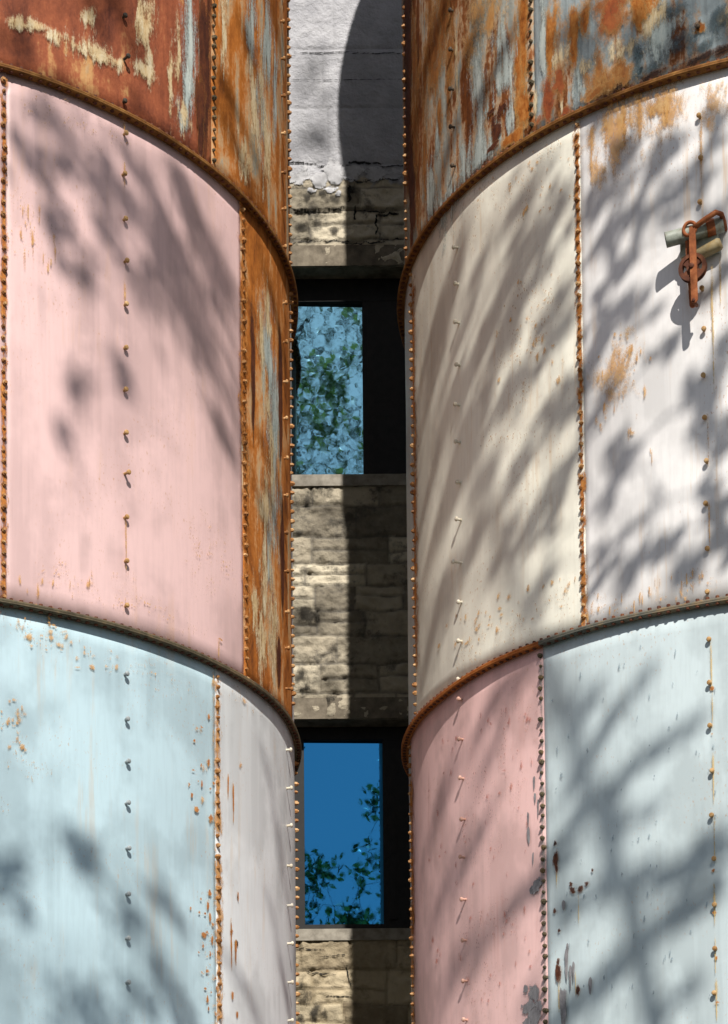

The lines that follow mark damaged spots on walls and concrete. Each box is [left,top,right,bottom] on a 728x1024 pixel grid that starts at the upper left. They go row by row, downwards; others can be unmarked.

peeling [8,0,199,133]
corrosion [195,0,213,159]
peeling [290,157,403,202]
crack [290,161,403,245]
corrosion [403,0,728,669]
corrosion [237,202,256,668]
corrosion [18,617,72,647]
corrosion [541,817,593,938]
corrosion [544,958,561,1007]